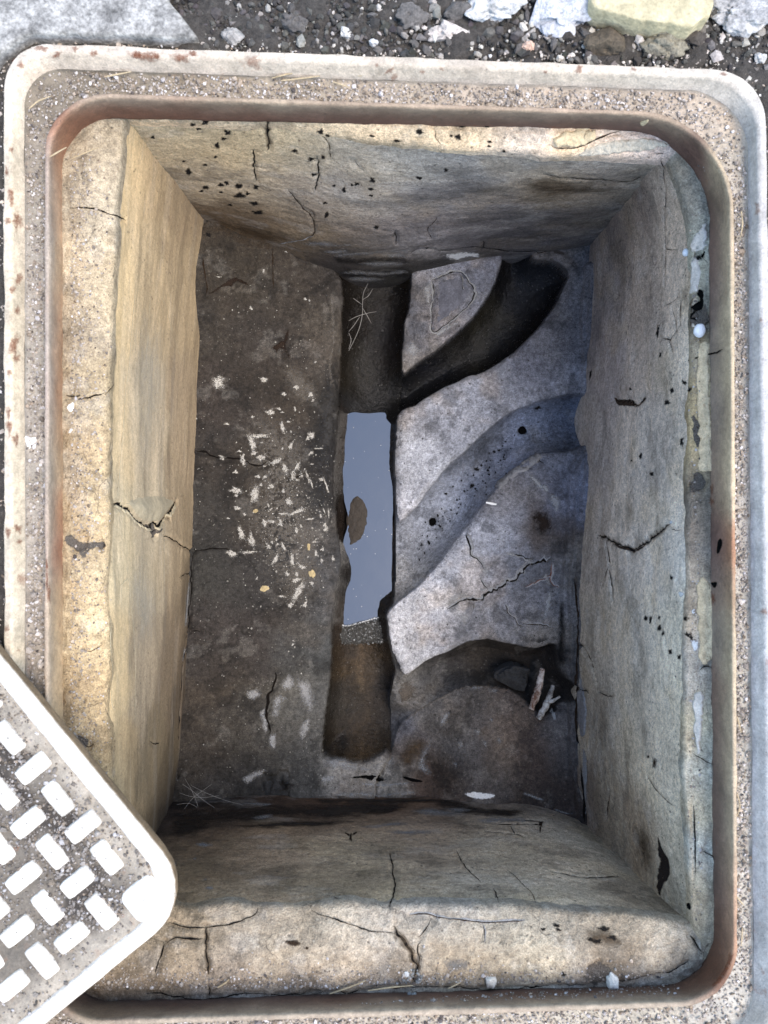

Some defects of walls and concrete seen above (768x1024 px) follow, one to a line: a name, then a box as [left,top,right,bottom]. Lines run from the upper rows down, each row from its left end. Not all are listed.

crack [114,502,230,745]
crack [262,672,277,732]
crack [446,533,613,822]
crack [600,525,679,593]
crack [150,852,701,1000]